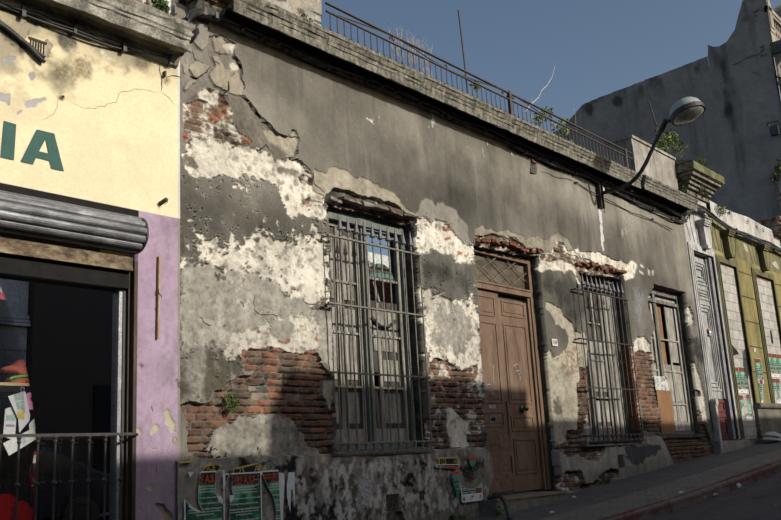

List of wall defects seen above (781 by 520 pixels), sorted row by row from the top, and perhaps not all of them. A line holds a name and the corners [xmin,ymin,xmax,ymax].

water stain [58,34,77,47]
peeling [0,92,47,115]
crack [44,34,242,119]
crack [223,87,299,150]
crack [289,157,325,192]
flaking render [180,16,655,520]
peeling [136,408,176,436]
flaking render [625,332,714,465]